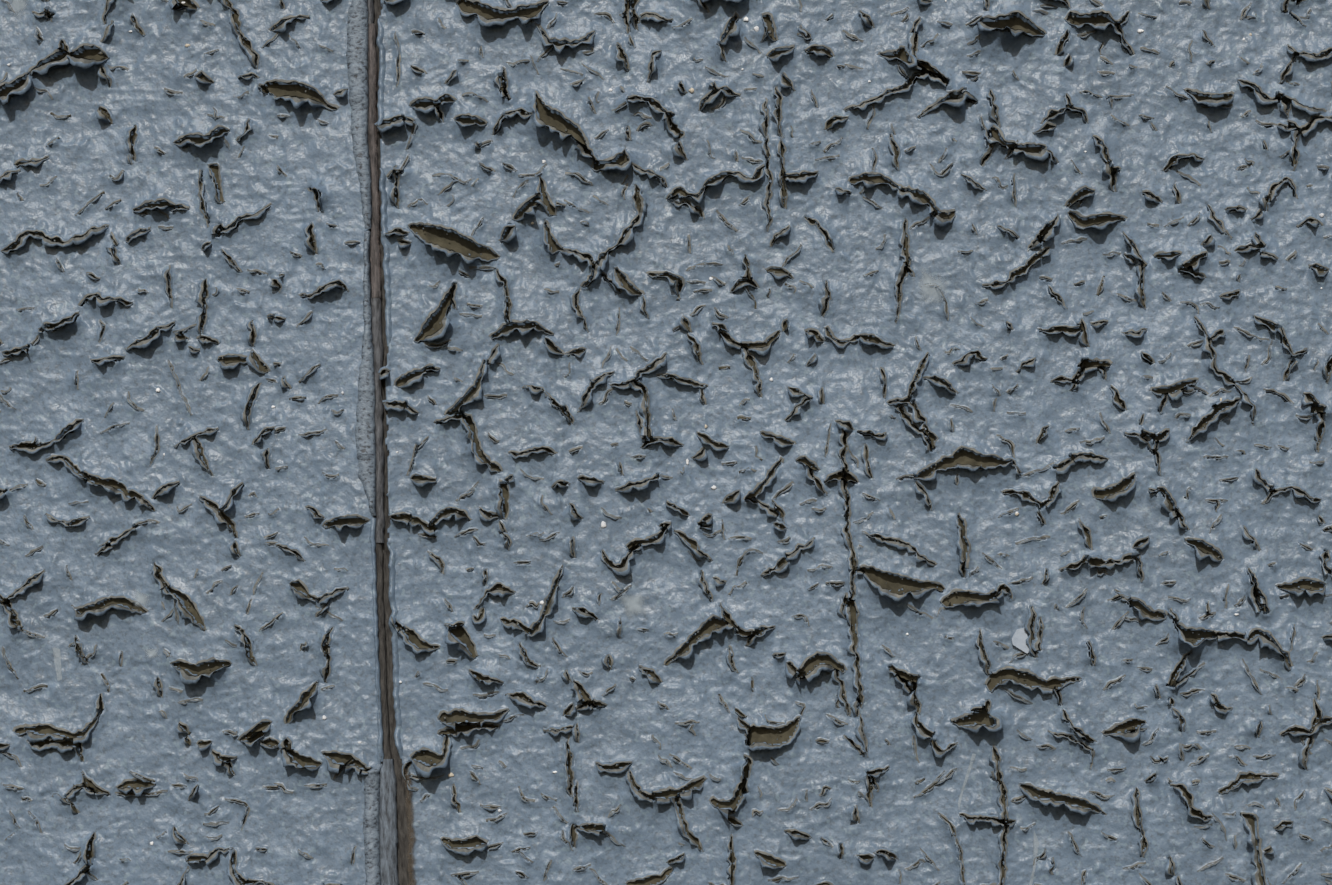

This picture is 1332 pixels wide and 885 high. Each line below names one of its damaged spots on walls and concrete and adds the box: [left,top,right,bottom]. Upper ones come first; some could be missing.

peeling [0,38,114,106]
peeling [408,90,632,172]
peeling [407,175,564,343]
peeling [434,318,555,533]
peeling [896,444,1023,481]
peeling [859,512,1015,608]
peeling [236,679,371,775]
peeling [402,706,510,792]
peeling [950,627,1082,734]
peeling [1114,588,1298,688]
peeling [595,714,801,885]
peeling [1019,782,1108,816]